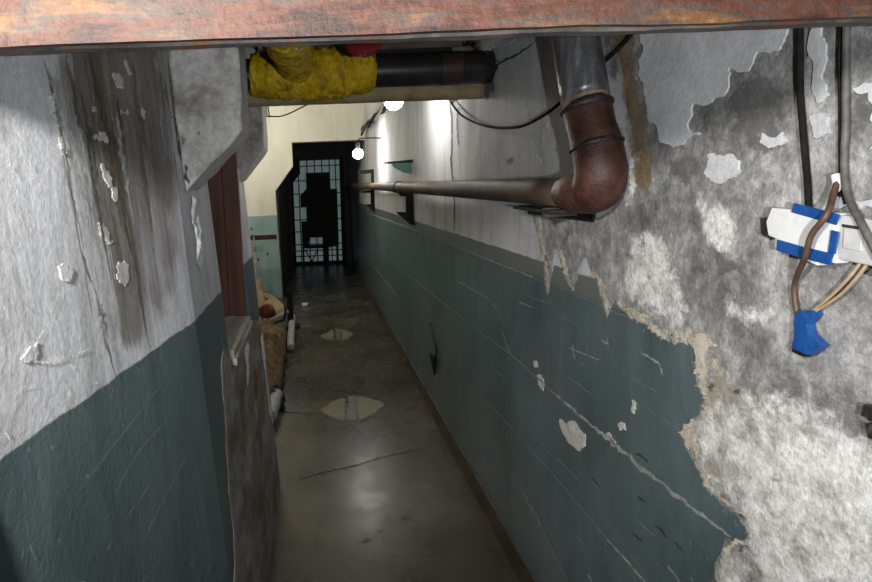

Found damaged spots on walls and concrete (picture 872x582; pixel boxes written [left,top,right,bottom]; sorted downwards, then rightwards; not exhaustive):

peeling [112,59,132,89]
peeling [48,93,70,155]
peeling [92,132,108,143]
peeling [98,163,118,202]
leakage [44,50,178,377]
peeling [97,222,114,245]
peeling [115,261,129,287]
flaking render [533,26,872,582]